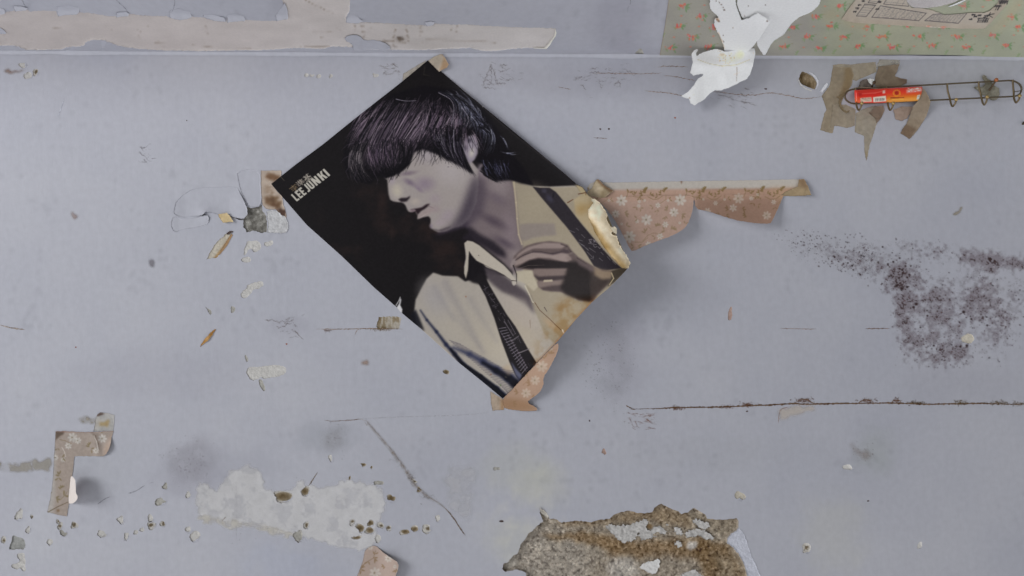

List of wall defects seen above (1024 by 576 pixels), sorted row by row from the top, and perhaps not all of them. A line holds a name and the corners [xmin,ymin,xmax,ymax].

peeling [0,0,556,51]
peeling [171,169,288,263]
water stain [793,235,1024,365]
crack [626,397,1023,423]
spalling [273,486,310,503]
spalling [361,463,396,503]
crack [326,419,465,535]
spalling [293,521,310,543]
flaking render [502,504,760,576]